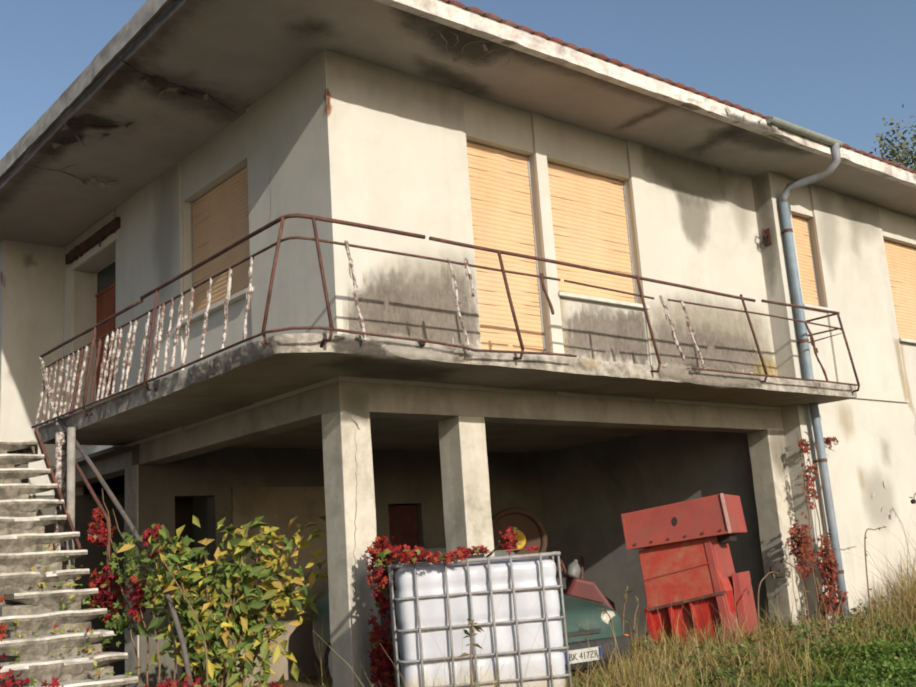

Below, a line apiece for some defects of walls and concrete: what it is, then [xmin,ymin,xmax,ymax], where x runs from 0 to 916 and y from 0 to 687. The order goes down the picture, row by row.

spalling [52,113,134,149]
leakage [645,150,726,242]
leakage [757,180,774,282]
leakage [349,269,479,345]
leakage [565,305,770,375]